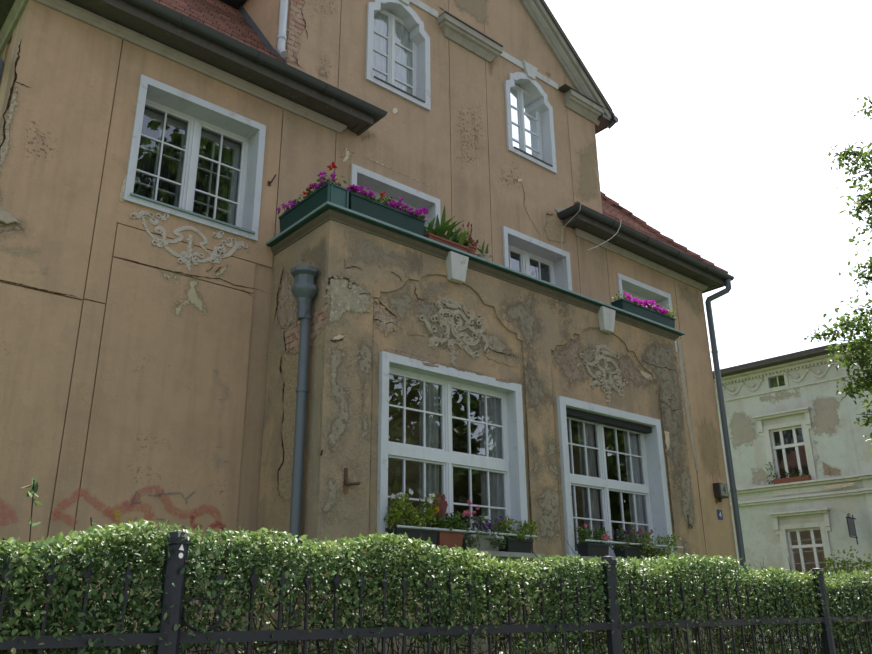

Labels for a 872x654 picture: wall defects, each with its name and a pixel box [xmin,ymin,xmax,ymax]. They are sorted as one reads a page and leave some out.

flaking render [287,0,333,64]
crack [0,39,33,149]
crack [1,280,79,298]
spalling [277,273,398,354]
peeling [813,397,840,443]
flaking render [816,459,854,489]